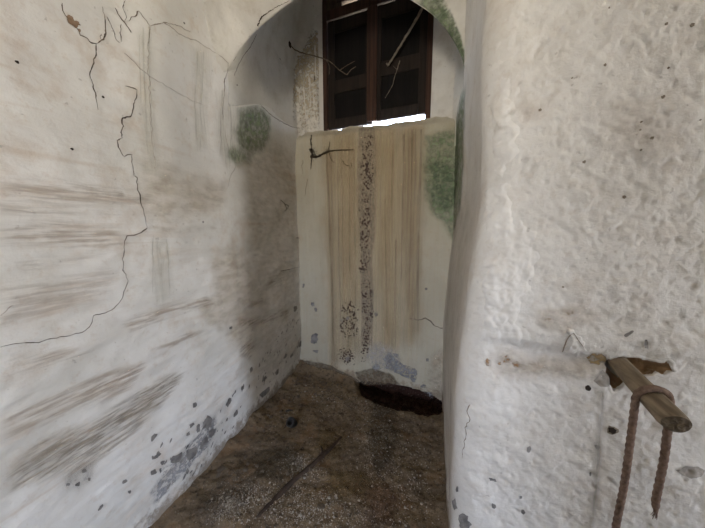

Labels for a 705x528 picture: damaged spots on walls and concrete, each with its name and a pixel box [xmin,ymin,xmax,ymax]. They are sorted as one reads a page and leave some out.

crack [2,1,288,347]
flaking render [151,306,301,501]
water stain [339,135,374,363]
spalling [562,328,678,394]